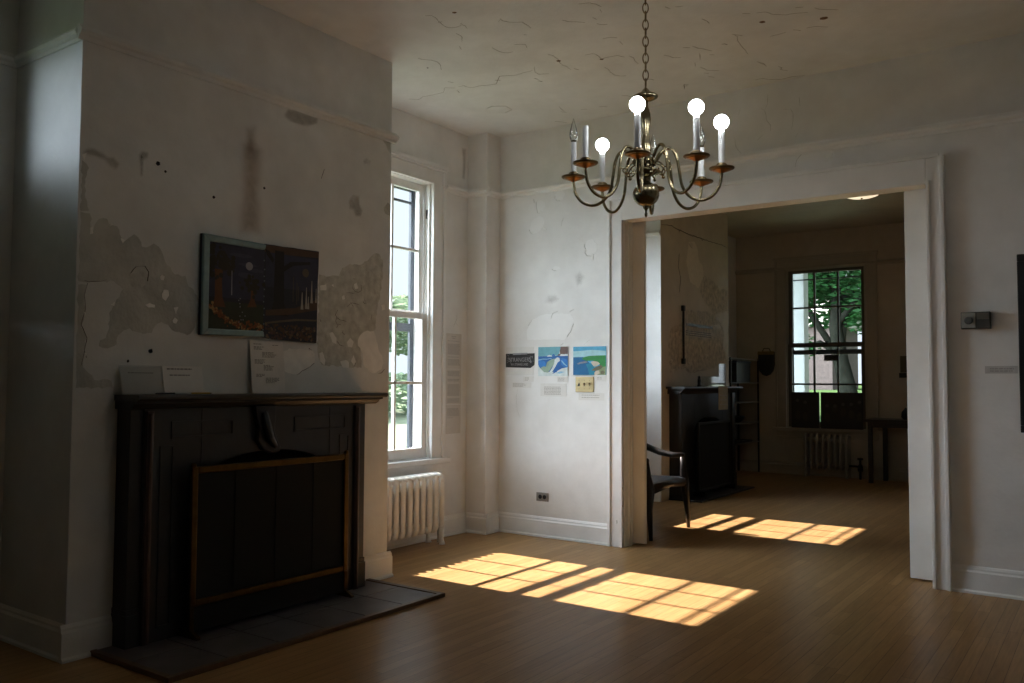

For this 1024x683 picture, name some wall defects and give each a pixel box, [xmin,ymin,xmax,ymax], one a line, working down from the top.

peeling [77,153,198,348]
peeling [317,253,383,368]